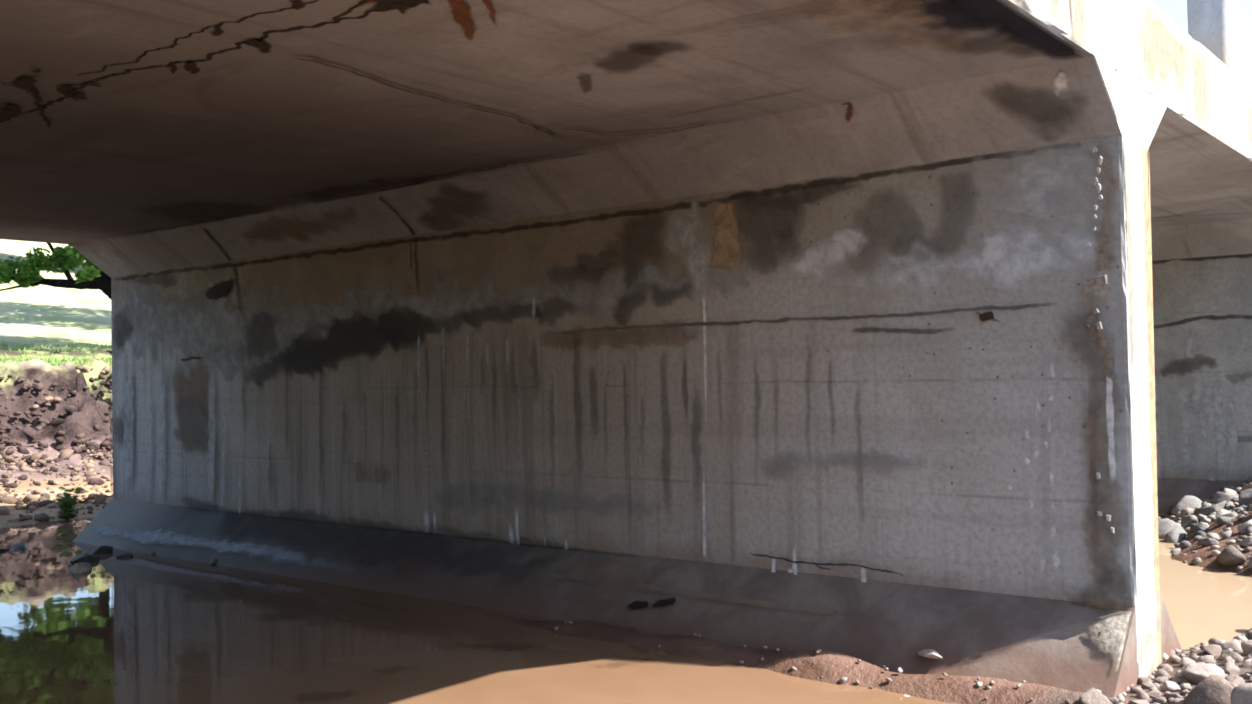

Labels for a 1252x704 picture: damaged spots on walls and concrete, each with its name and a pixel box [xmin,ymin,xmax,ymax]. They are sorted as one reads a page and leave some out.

crack [0,0,706,136]
rust [448,0,496,40]
damp [599,45,680,72]
rust [1143,13,1190,86]
damp [670,201,742,393]
damp [793,230,863,272]
damp [881,0,1212,675]
damp [110,381,133,491]
damp [149,365,224,511]
rust [1142,147,1161,664]
damp [771,551,797,575]